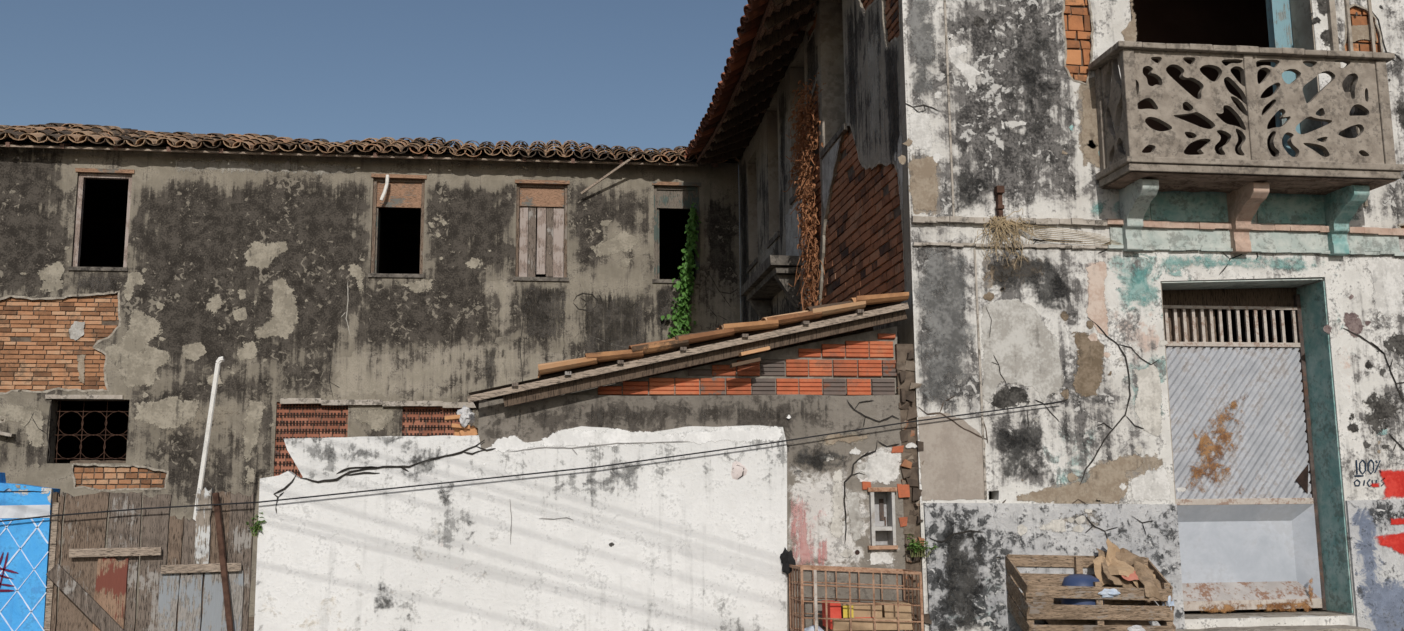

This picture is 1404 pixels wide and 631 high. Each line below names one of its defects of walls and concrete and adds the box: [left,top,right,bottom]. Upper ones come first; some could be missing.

leakage [1006,33,1058,142]
flaking render [1053,0,1100,168]
peeling [1121,0,1137,42]
flaking render [785,77,944,306]
flaking render [0,246,207,468]
peeling [206,241,308,385]
leakage [520,286,670,360]
leakage [917,250,975,402]
leakage [988,258,1076,317]
peeling [981,256,1186,536]
corrosion [1190,398,1245,490]
leakage [938,523,984,631]